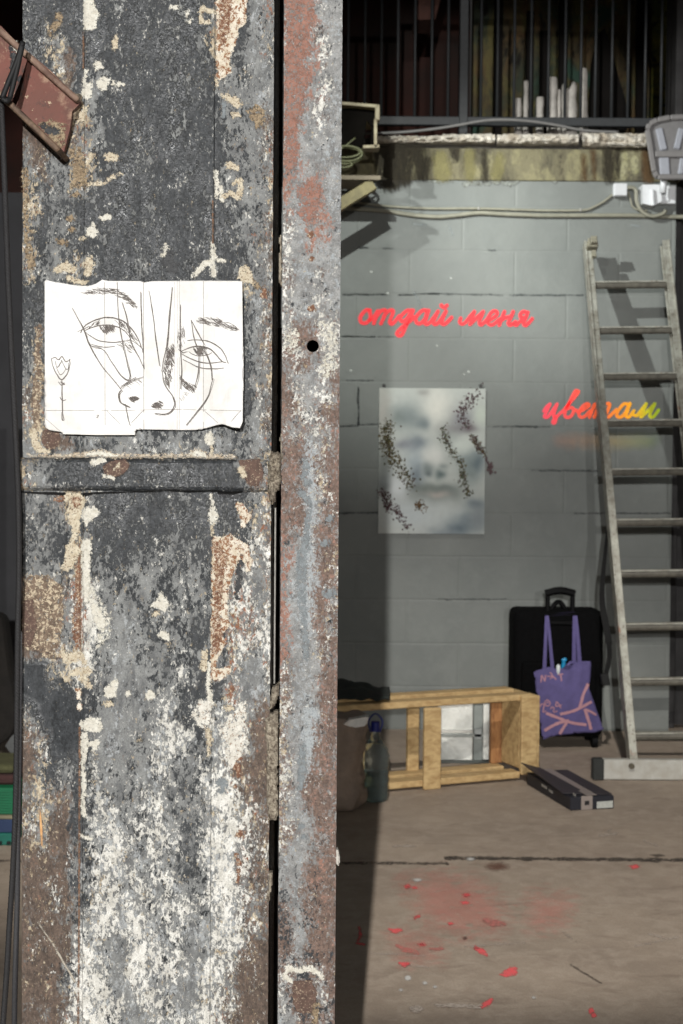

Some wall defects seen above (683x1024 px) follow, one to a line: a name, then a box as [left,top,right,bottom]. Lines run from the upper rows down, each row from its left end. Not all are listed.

peeling [37,0,125,198]
peeling [55,213,112,247]
peeling [191,161,244,278]
peeling [169,0,267,129]
rust [284,0,323,238]
leakage [373,143,430,192]
leakage [603,147,638,183]
rust [21,544,82,660]
peeling [53,492,112,648]
peeling [189,493,253,768]
peeling [59,649,131,817]
crack [340,854,683,865]